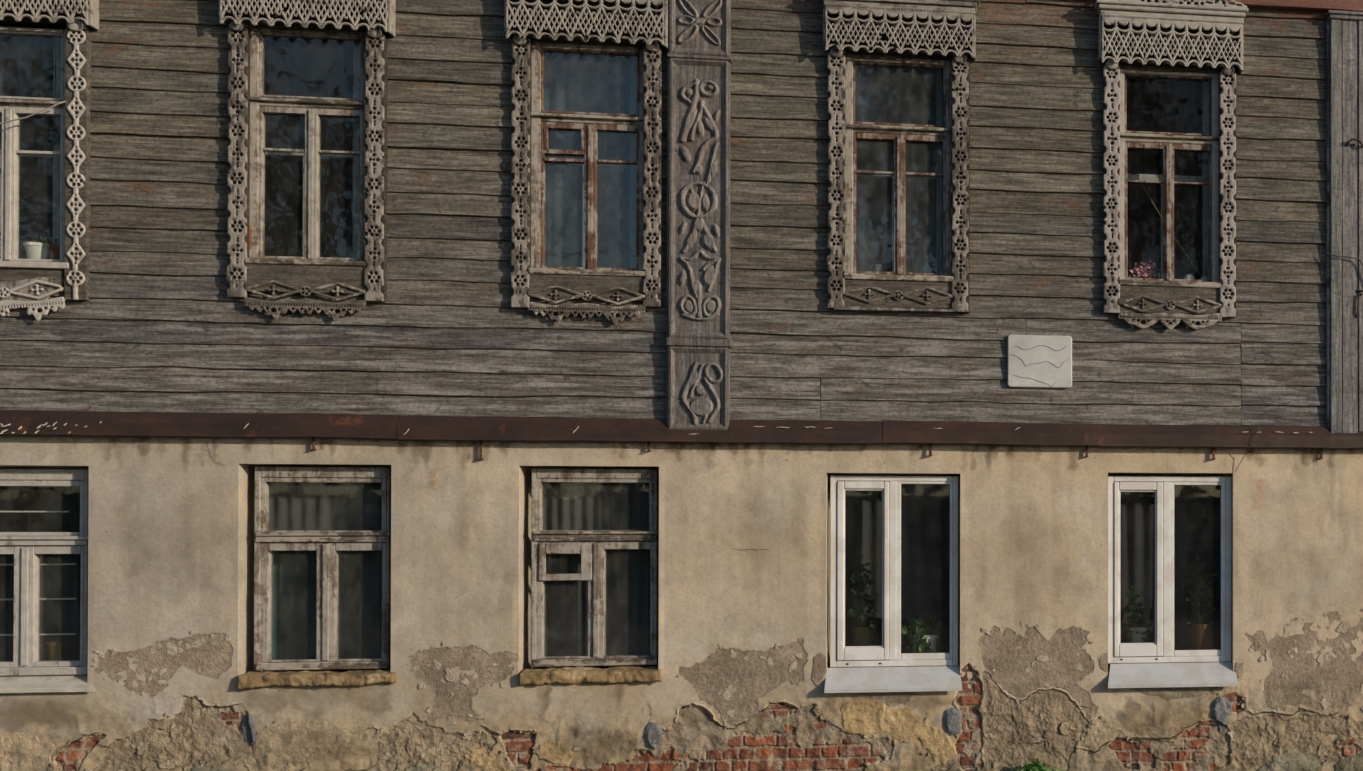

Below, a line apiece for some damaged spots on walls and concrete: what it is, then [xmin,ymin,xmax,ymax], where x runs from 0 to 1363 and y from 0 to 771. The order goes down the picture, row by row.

spalling [50,696,253,771]
peeling [92,630,234,698]
flaking render [367,638,894,771]
spalling [869,692,913,707]
spalling [953,621,1108,771]
peeling [1108,608,1363,771]